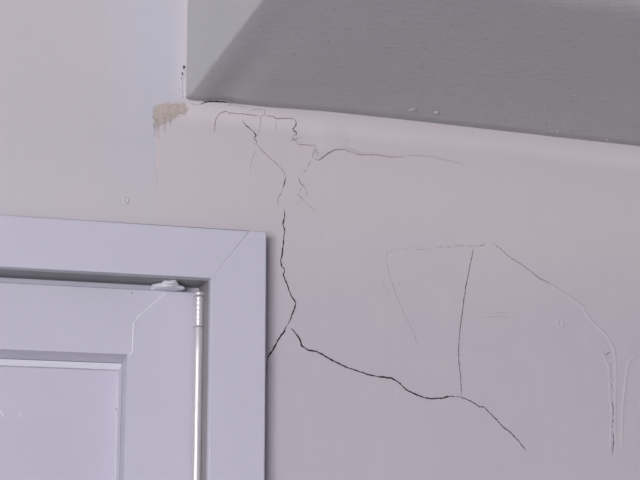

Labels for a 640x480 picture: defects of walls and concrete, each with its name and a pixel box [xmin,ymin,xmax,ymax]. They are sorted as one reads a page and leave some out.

crack [189,100,568,449]